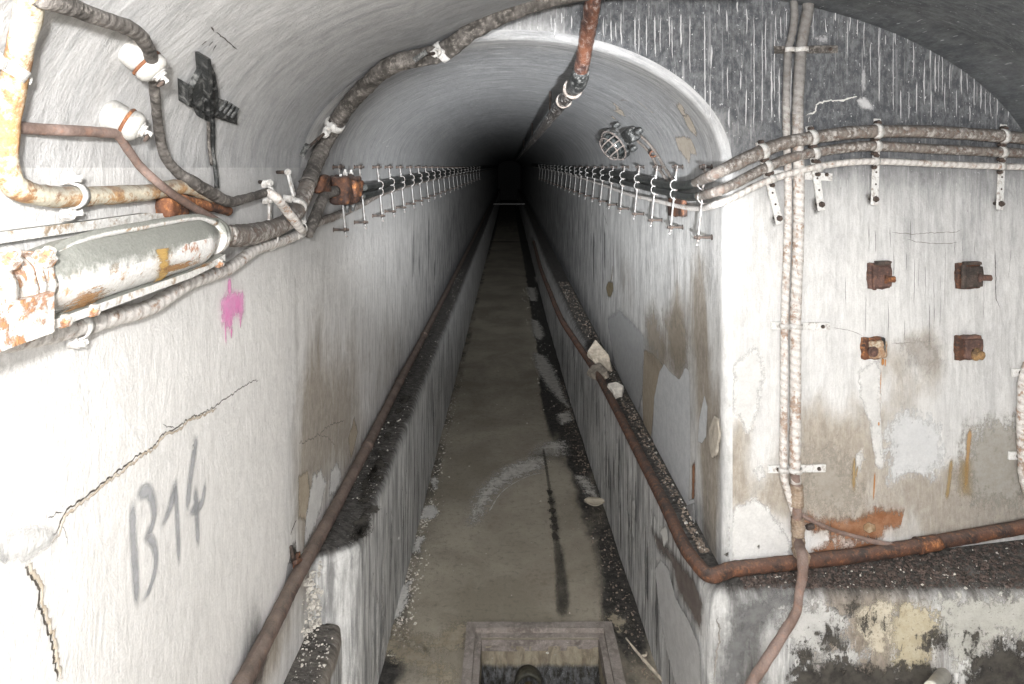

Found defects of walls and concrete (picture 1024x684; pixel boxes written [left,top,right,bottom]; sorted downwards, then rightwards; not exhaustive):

crack [50,380,257,543]
peeling [285,463,341,583]
leakage [530,311,703,648]
peeling [608,311,707,523]
leakage [803,444,866,520]
rust [804,475,904,552]
peeling [855,361,945,484]
rust [946,431,972,497]
leakage [956,412,1023,515]
leakage [721,590,794,684]
leakage [786,596,1024,684]